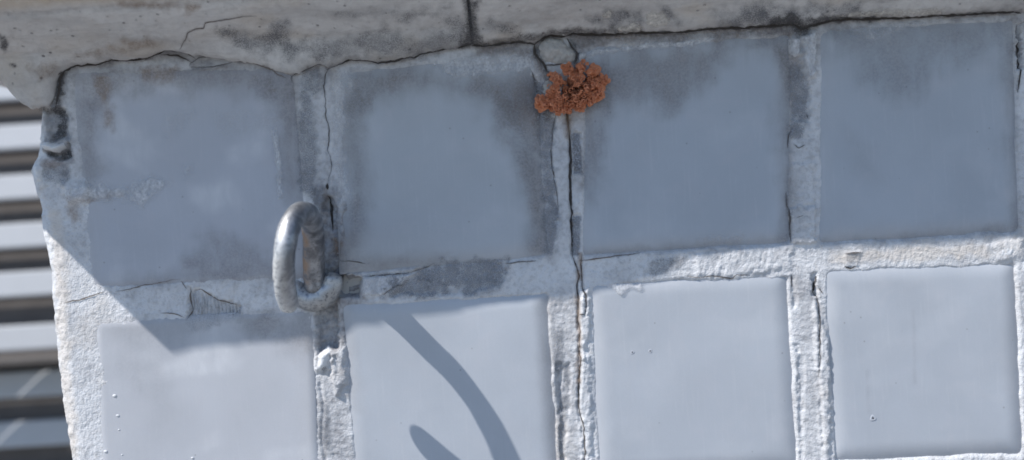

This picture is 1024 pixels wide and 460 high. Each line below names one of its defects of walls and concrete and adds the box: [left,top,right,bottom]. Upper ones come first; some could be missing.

crack [55,11,1022,229]
crack [550,100,636,459]
crack [786,197,803,240]